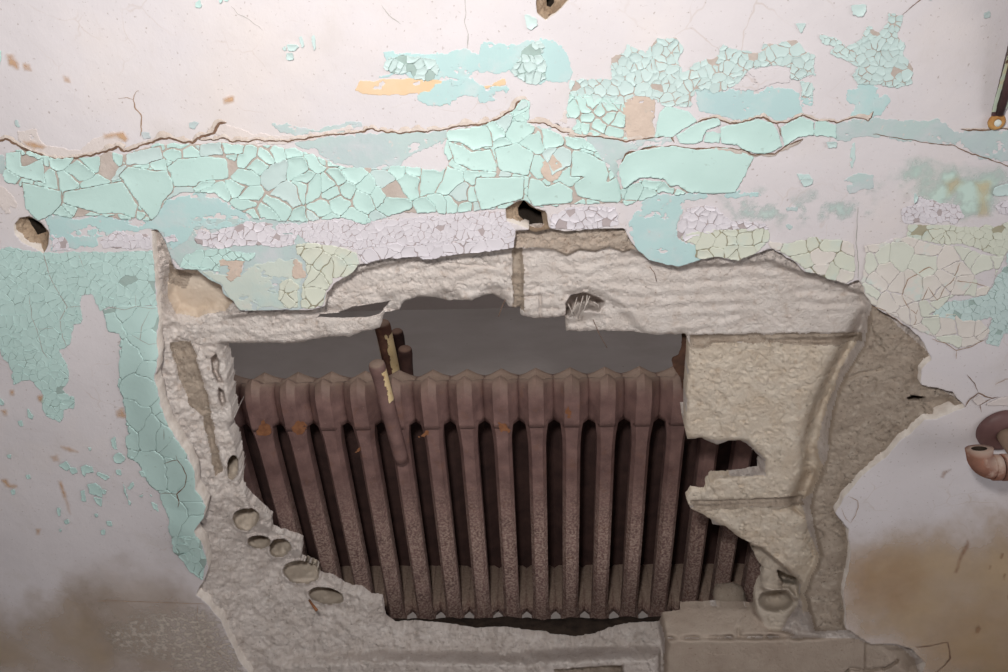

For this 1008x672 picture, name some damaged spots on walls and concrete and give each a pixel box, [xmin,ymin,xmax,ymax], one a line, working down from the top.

spalling [525,0,567,30]
crack [0,90,1008,167]
peeling [781,13,1008,162]
peeling [0,35,816,423]
crack [872,264,1006,409]
peeling [59,437,159,535]
spalling [157,170,1008,672]
leakage [42,599,241,672]
leakage [846,533,1008,672]